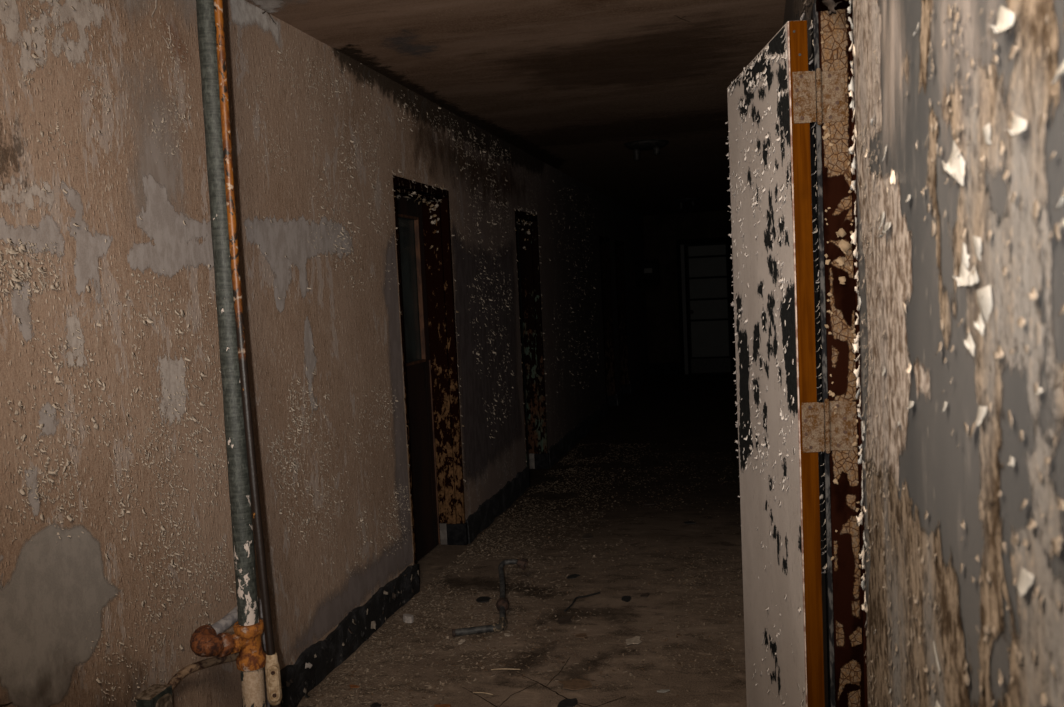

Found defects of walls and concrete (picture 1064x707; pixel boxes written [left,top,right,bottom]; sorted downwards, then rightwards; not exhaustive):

peeling [0,0,117,169]
peeling [244,48,551,438]
peeling [725,26,802,580]
peeling [793,0,1064,707]
peeling [752,591,804,707]